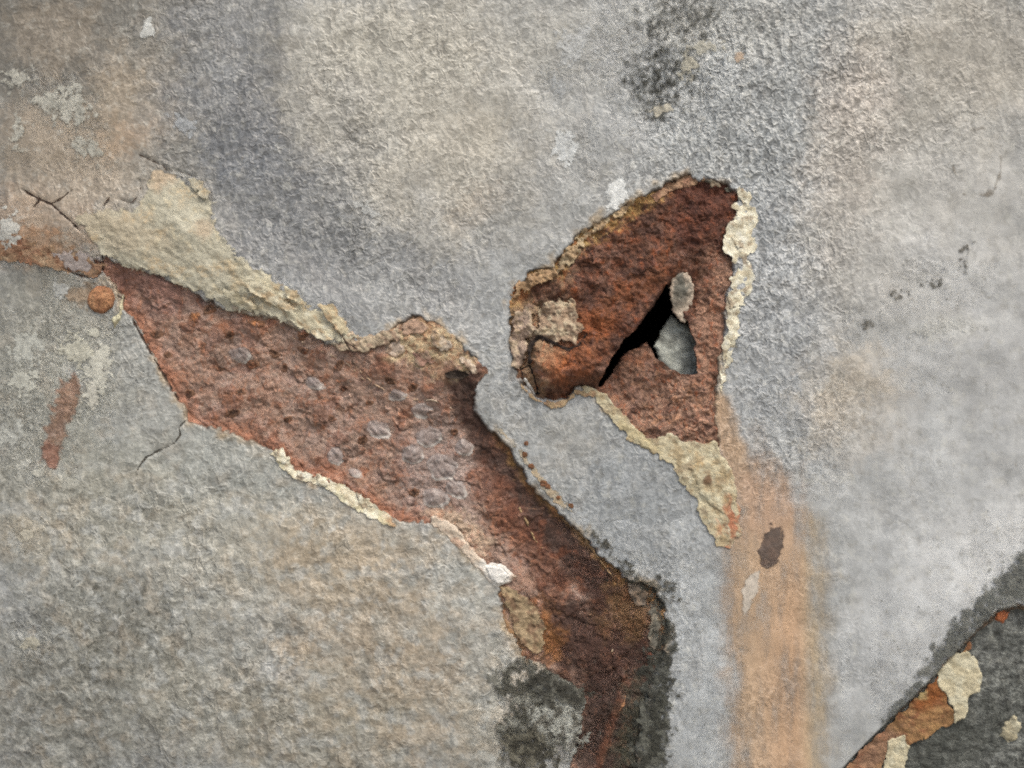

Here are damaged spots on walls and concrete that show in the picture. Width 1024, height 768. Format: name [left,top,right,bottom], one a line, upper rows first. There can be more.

leakage [630,0,720,41]
crack [24,189,78,229]
peeling [53,169,357,343]
crack [132,320,186,471]
peeling [269,448,396,527]
corrosion [0,219,667,768]
peeling [430,516,517,587]
peeling [582,385,742,549]
corrosion [508,175,824,768]
peeling [884,735,910,768]
leakage [878,550,1024,732]
peeling [937,651,982,724]